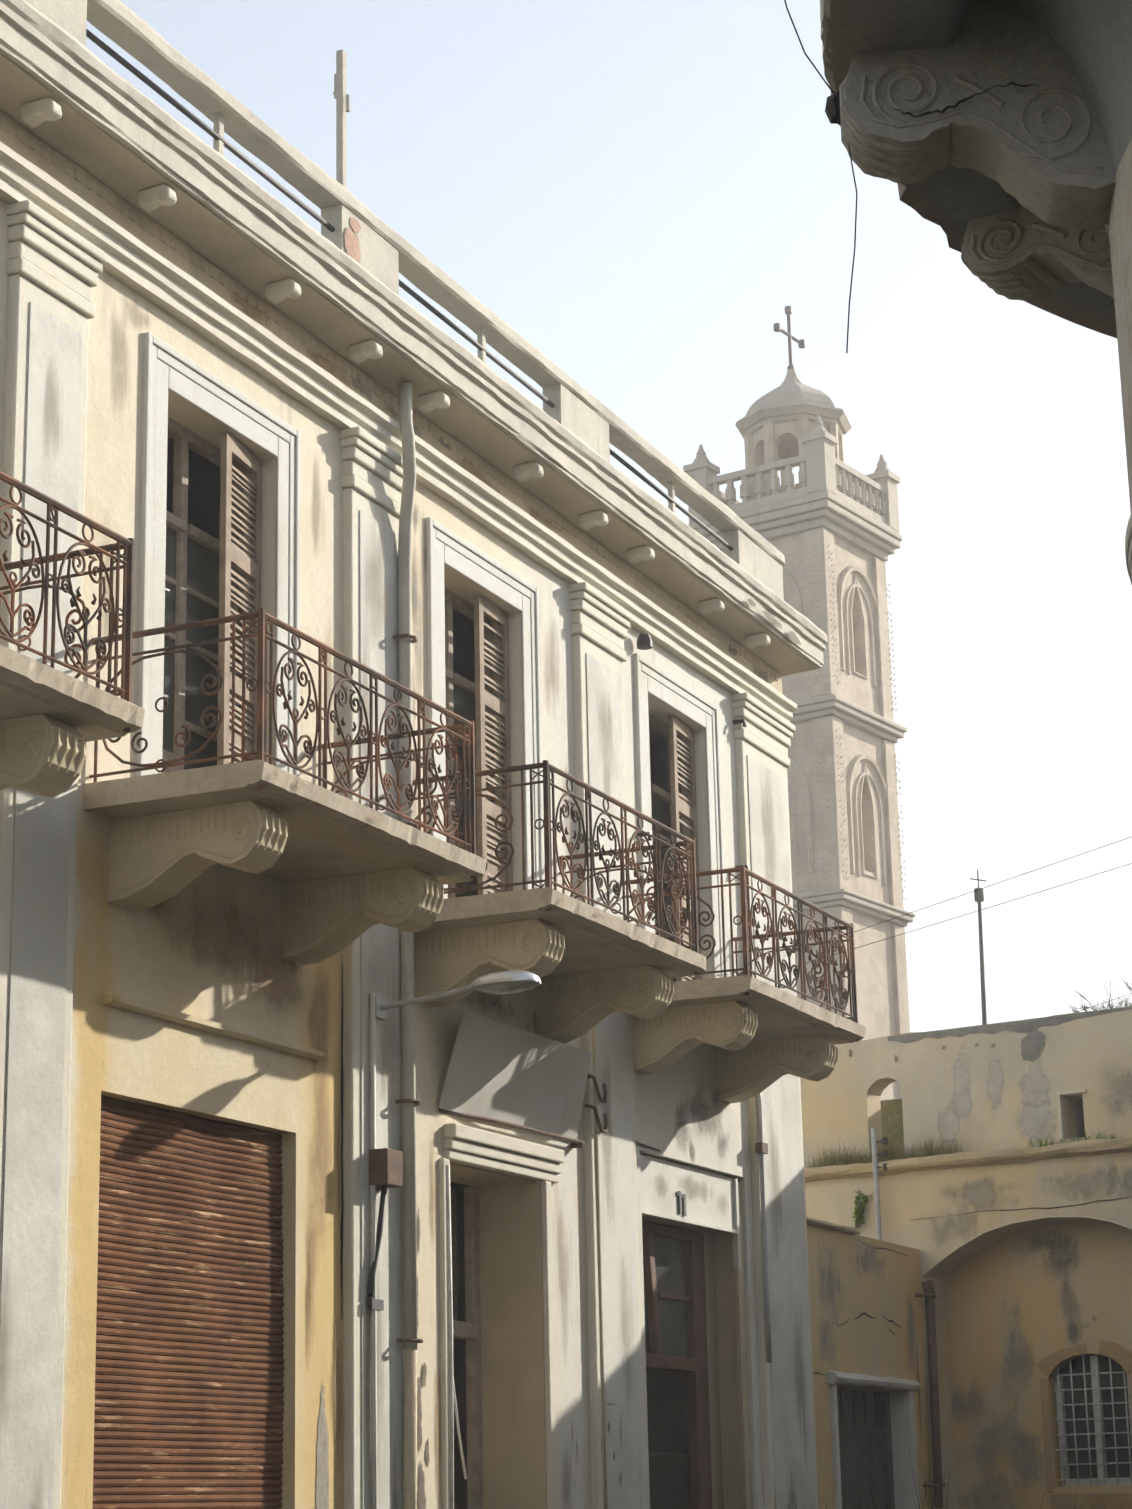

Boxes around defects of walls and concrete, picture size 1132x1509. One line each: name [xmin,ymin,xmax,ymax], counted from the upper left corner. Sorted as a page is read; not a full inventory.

crack [895,82,1040,117]
crack [859,1196,1132,1257]
crack [834,1312,902,1334]
peeling [313,1385,329,1509]